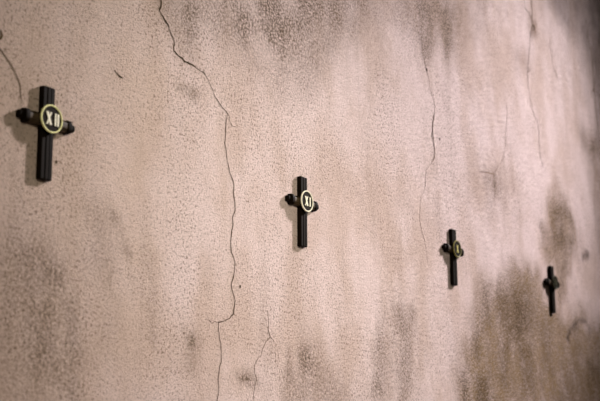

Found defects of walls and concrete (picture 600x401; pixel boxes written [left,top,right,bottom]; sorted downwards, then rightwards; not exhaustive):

crack [0,29,23,104]
crack [159,0,235,401]
water stain [545,196,577,296]
water stain [458,264,600,401]